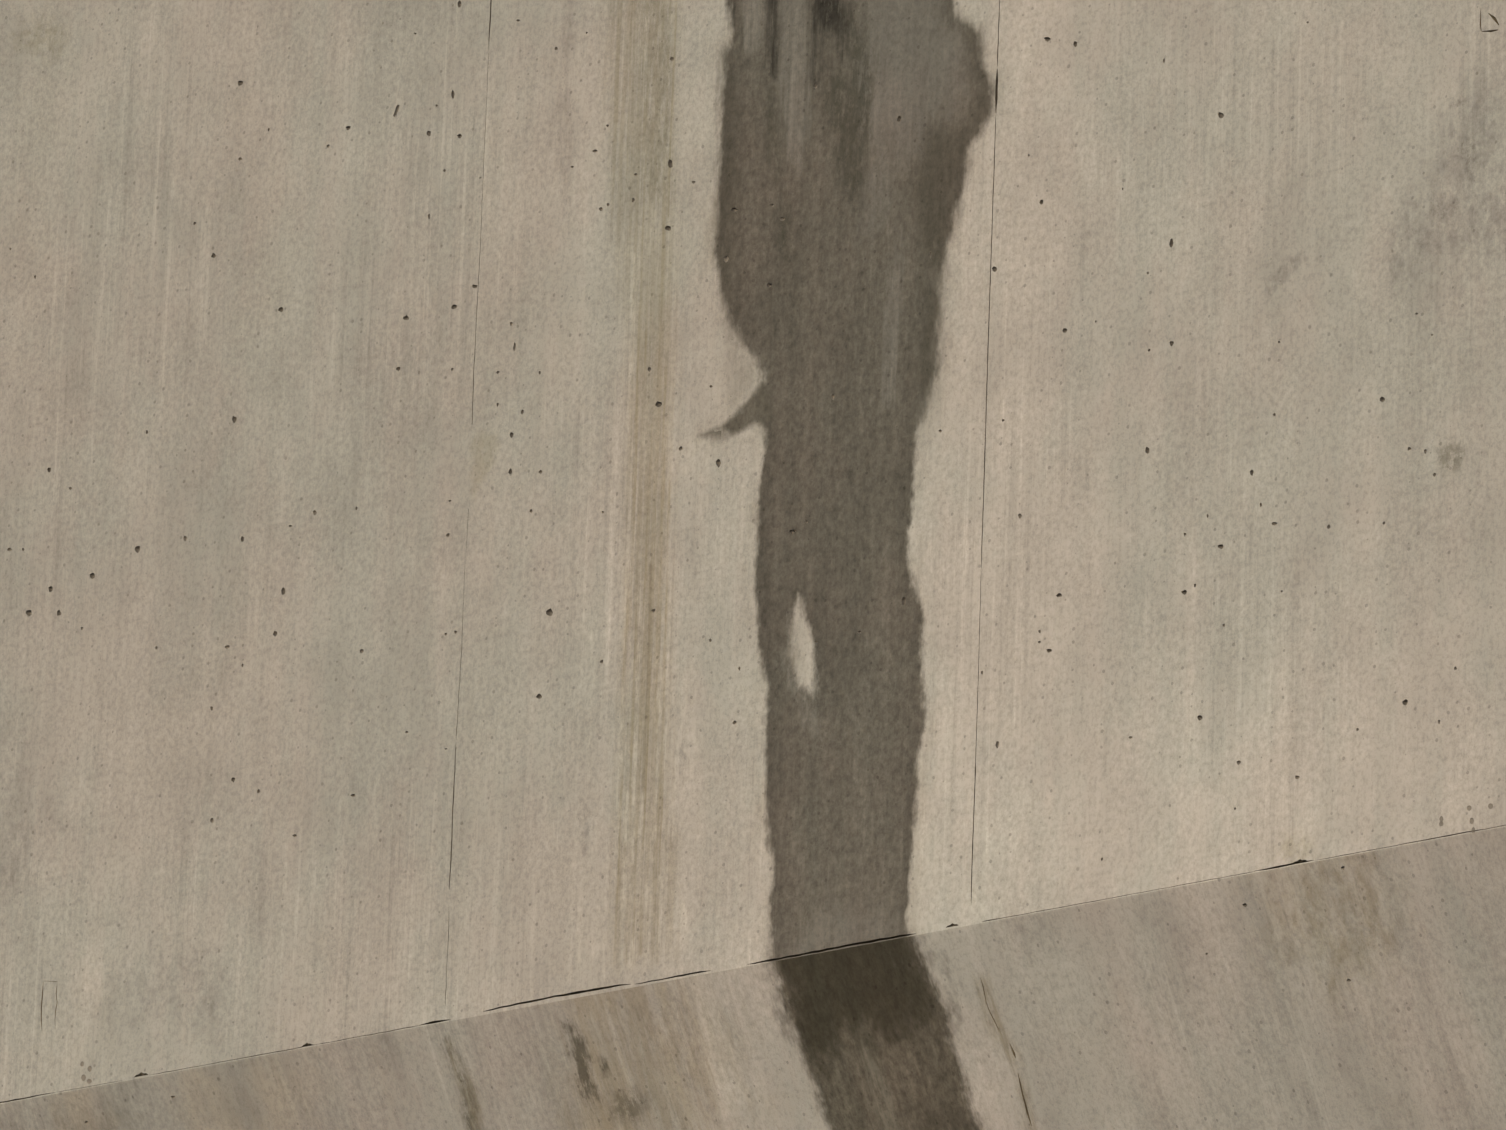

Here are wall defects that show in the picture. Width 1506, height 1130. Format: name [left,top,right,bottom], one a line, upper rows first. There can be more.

water stain [427,0,1026,1130]